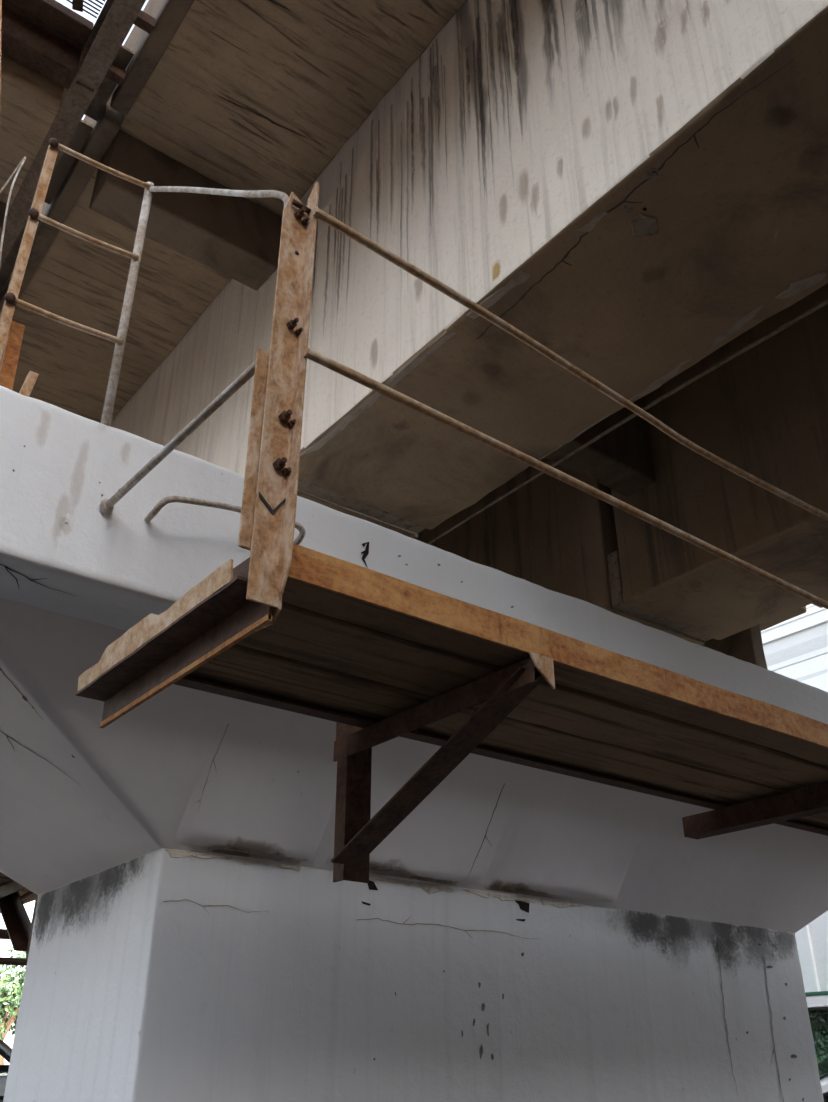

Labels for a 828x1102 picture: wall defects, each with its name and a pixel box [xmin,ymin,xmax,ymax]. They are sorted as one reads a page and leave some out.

crack [607,59,793,213]
crack [476,232,589,339]
crack [0,564,77,597]
crack [2,732,79,784]
crack [468,783,505,876]
crack [357,918,538,939]